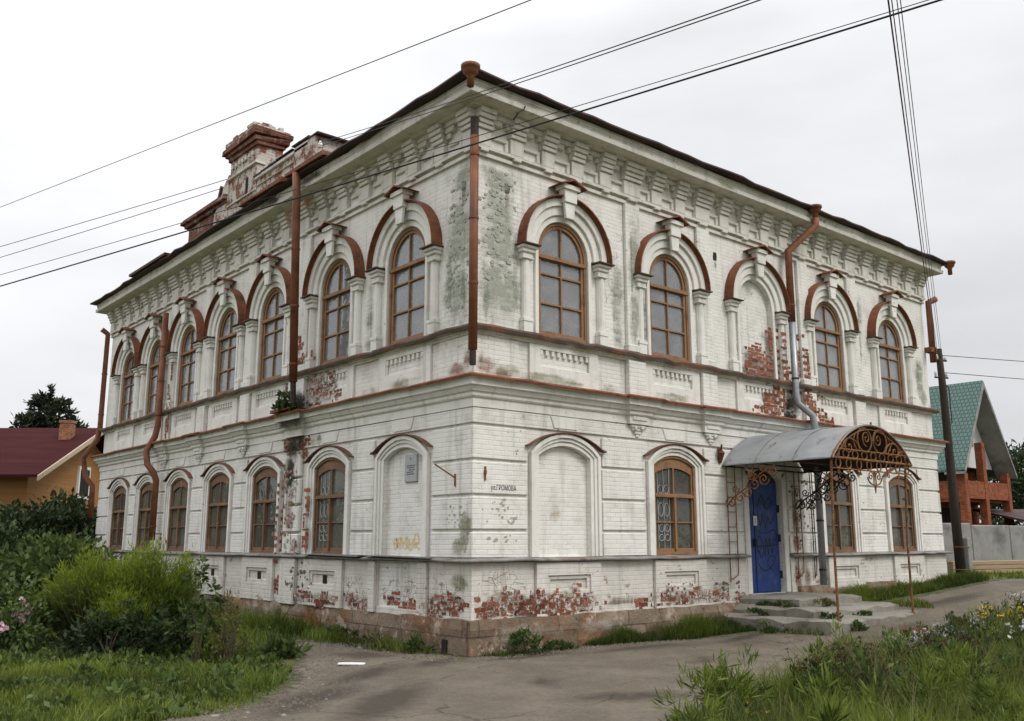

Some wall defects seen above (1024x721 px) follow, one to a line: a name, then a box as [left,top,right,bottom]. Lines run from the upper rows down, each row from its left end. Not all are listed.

flaking render [298,336,342,409]
flaking render [744,327,834,424]
flaking render [272,435,368,611]
flaking render [383,583,607,620]
flaking render [634,580,746,609]